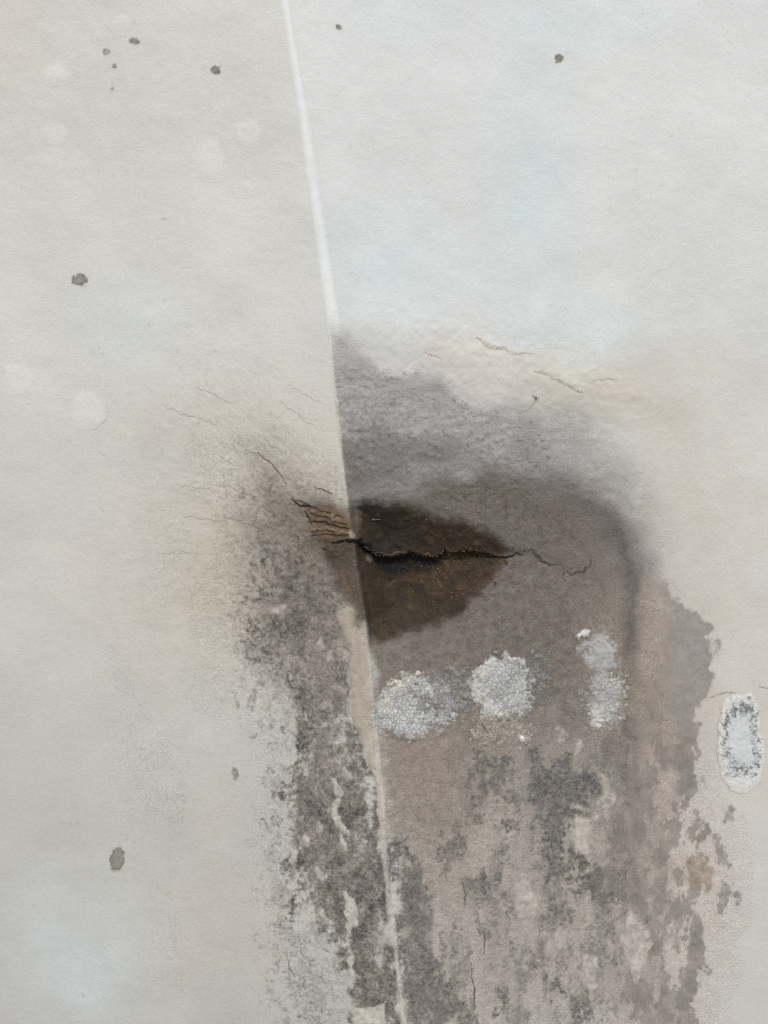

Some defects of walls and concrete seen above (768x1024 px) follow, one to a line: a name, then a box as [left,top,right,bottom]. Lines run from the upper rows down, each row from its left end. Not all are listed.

crack [165,386,592,582]
damp [96,306,686,1024]
damp [695,630,736,792]